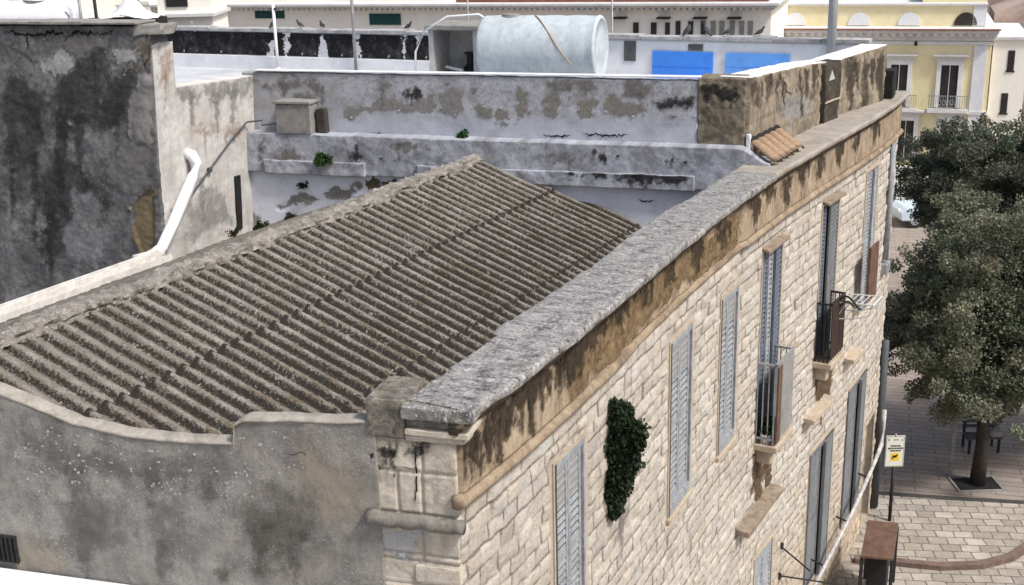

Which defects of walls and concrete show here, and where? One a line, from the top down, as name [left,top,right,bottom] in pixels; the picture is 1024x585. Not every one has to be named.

crack [7,30,112,49]
peeling [344,86,561,121]
crack [545,131,627,139]
peeling [577,93,647,120]
damp [1,51,133,280]
flaking render [106,138,157,253]
damp [463,259,677,483]
crack [405,443,417,500]